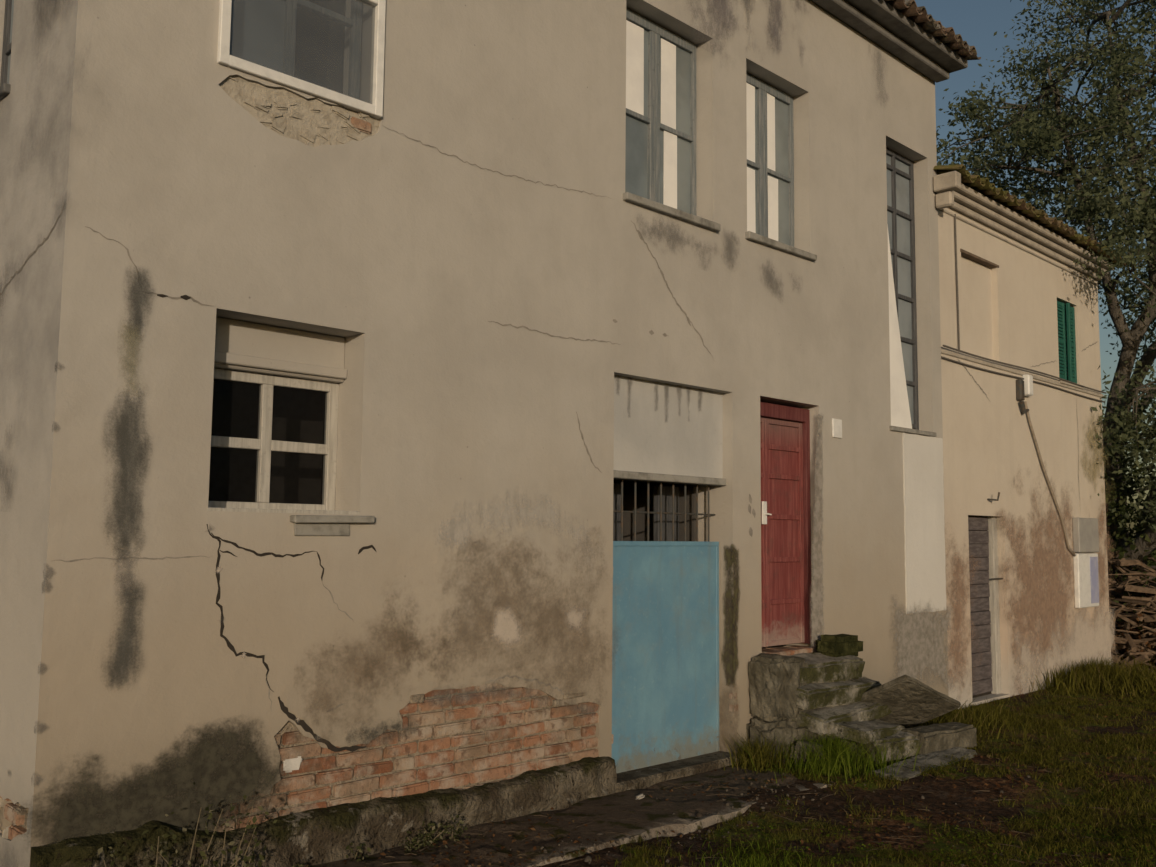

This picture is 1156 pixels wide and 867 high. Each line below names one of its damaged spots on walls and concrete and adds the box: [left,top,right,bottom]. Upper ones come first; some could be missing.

flaking render [218,76,380,147]
crack [384,126,611,199]
crack [0,201,211,306]
water stain [129,274,149,331]
crack [631,221,713,357]
water stain [113,399,146,552]
water stain [108,572,140,684]
crack [53,524,383,752]
water stain [1002,500,1072,663]
flaking render [0,796,29,840]
water stain [24,726,283,845]
flaking render [214,683,599,832]